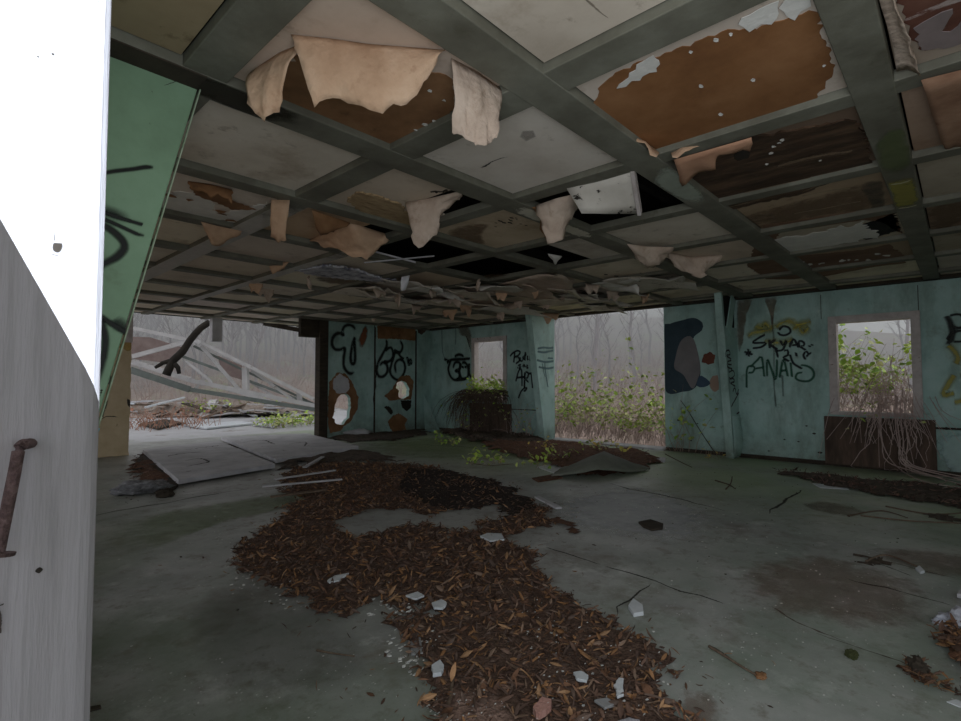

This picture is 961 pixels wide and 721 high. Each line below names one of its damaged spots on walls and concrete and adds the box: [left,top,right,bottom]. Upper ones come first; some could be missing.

peeling [879,0,961,76]
peeling [282,55,455,143]
peeling [593,0,835,158]
peeling [656,169,702,200]
hole [328,372,359,433]
spalling [384,375,414,415]
crack [546,547,724,614]